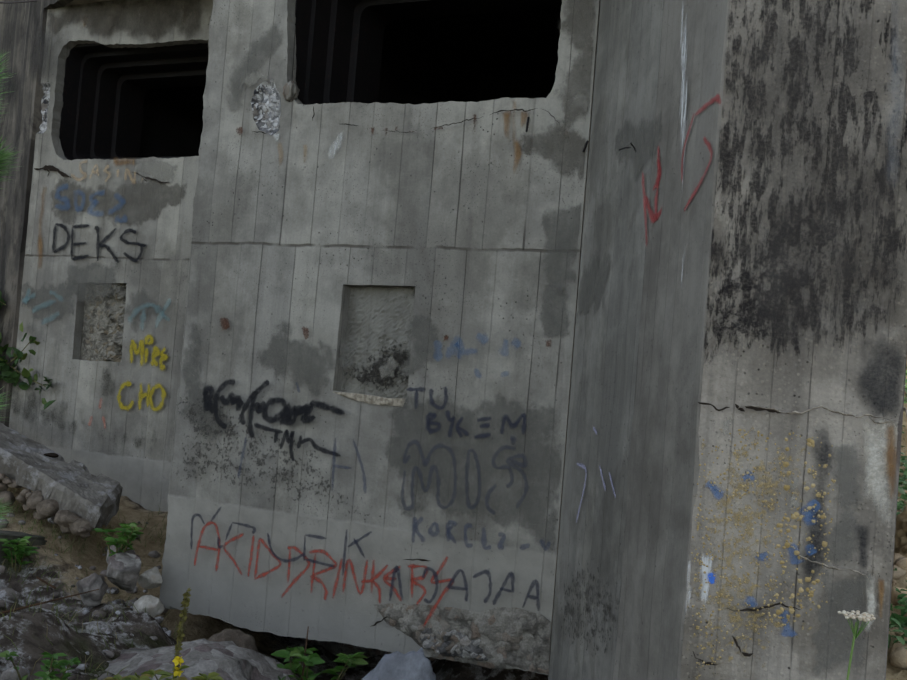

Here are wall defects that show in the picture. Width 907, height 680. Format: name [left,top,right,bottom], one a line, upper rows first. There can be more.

spalling [245,73,300,135]
leakage [704,0,907,362]
spalling [333,392,406,407]
crack [698,402,907,424]
spalling [374,603,551,674]